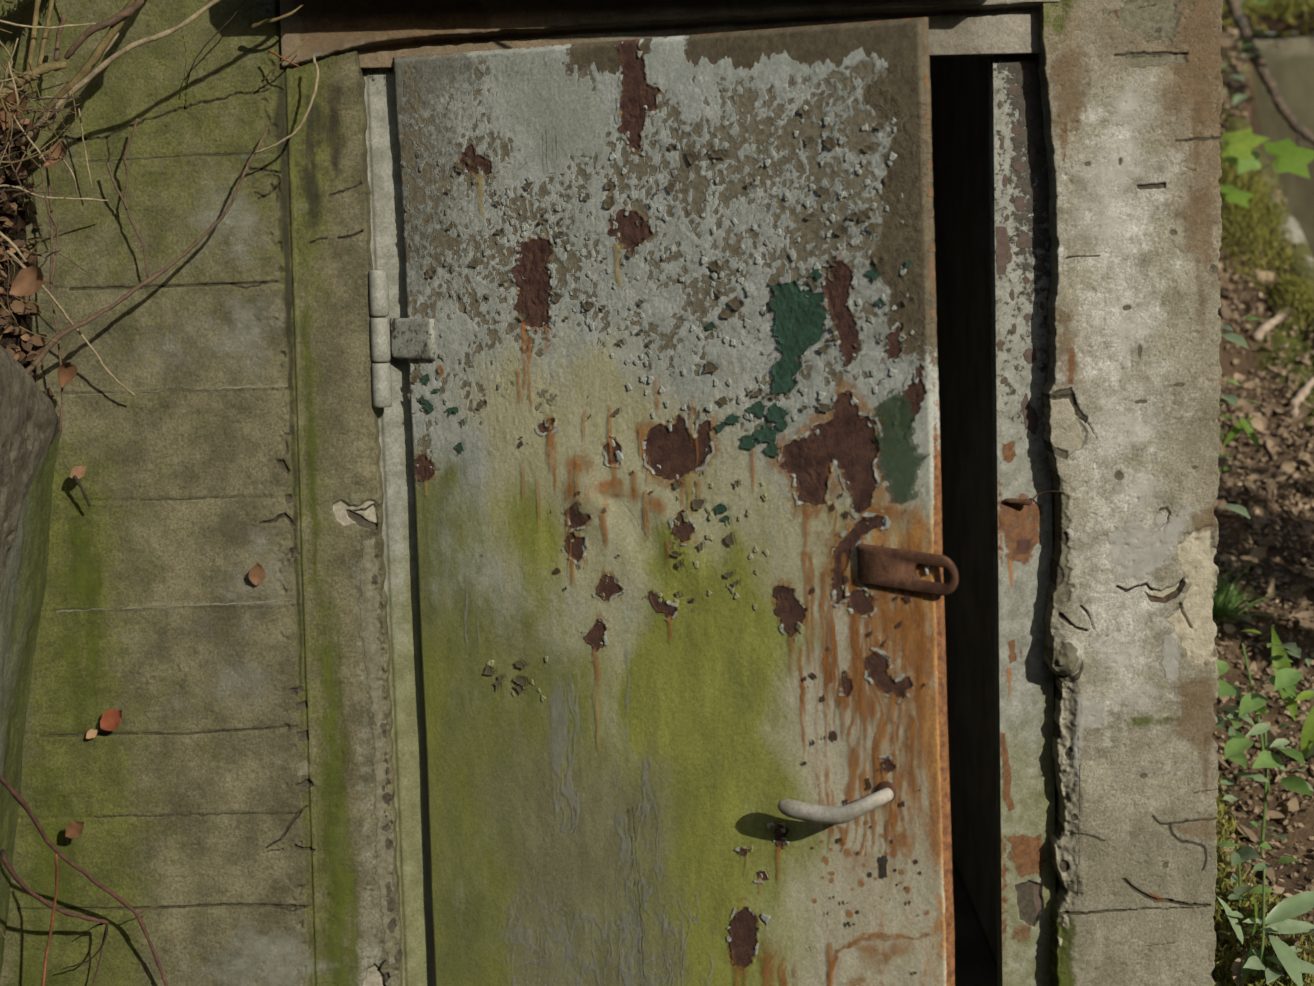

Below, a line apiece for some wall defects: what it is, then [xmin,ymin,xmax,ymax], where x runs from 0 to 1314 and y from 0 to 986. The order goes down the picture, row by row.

crack [57,30,281,199]
damp [275,87,308,388]
damp [304,89,340,218]
peeling [401,105,912,457]
damp [290,392,318,618]
peeling [869,357,930,512]
corrosion [773,260,930,986]
corrosion [735,821,790,884]
spalling [1050,677,1079,946]
crack [1057,736,1206,915]
crack [1152,789,1217,871]
corrosion [727,907,787,986]